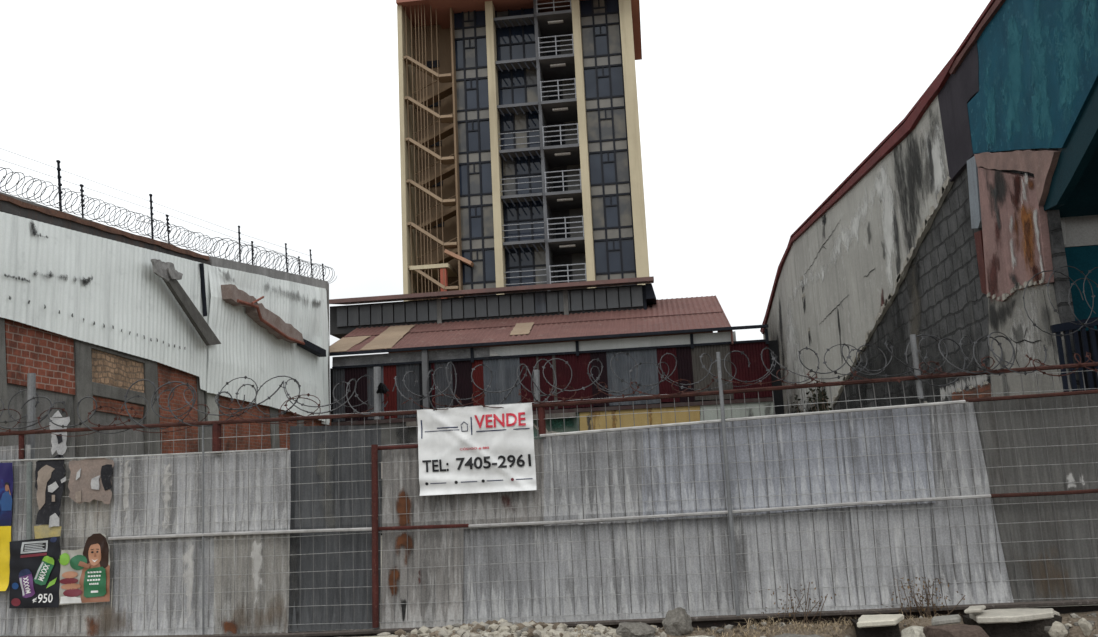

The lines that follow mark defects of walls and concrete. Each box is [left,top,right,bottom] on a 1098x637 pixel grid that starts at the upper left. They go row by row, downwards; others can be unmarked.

leakage [795,112,986,410]
corrosion [1010,174,1042,283]
leakage [771,302,826,413]
corrosion [389,490,412,595]